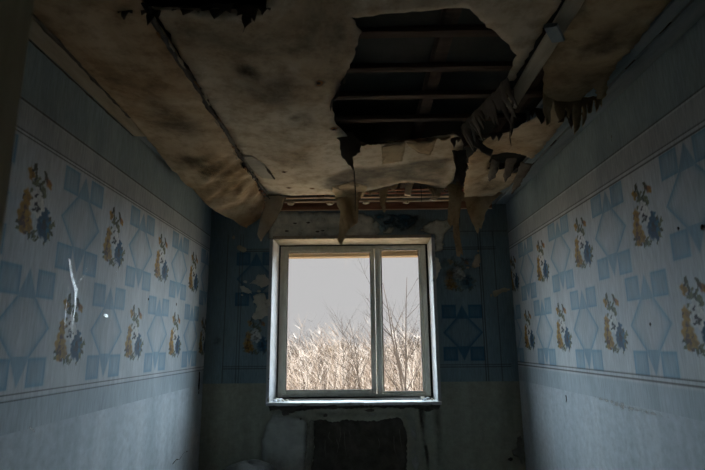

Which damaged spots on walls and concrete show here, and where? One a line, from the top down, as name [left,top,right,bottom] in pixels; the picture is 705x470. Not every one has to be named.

crack [141,3,293,199]
flaking render [268,404,440,470]